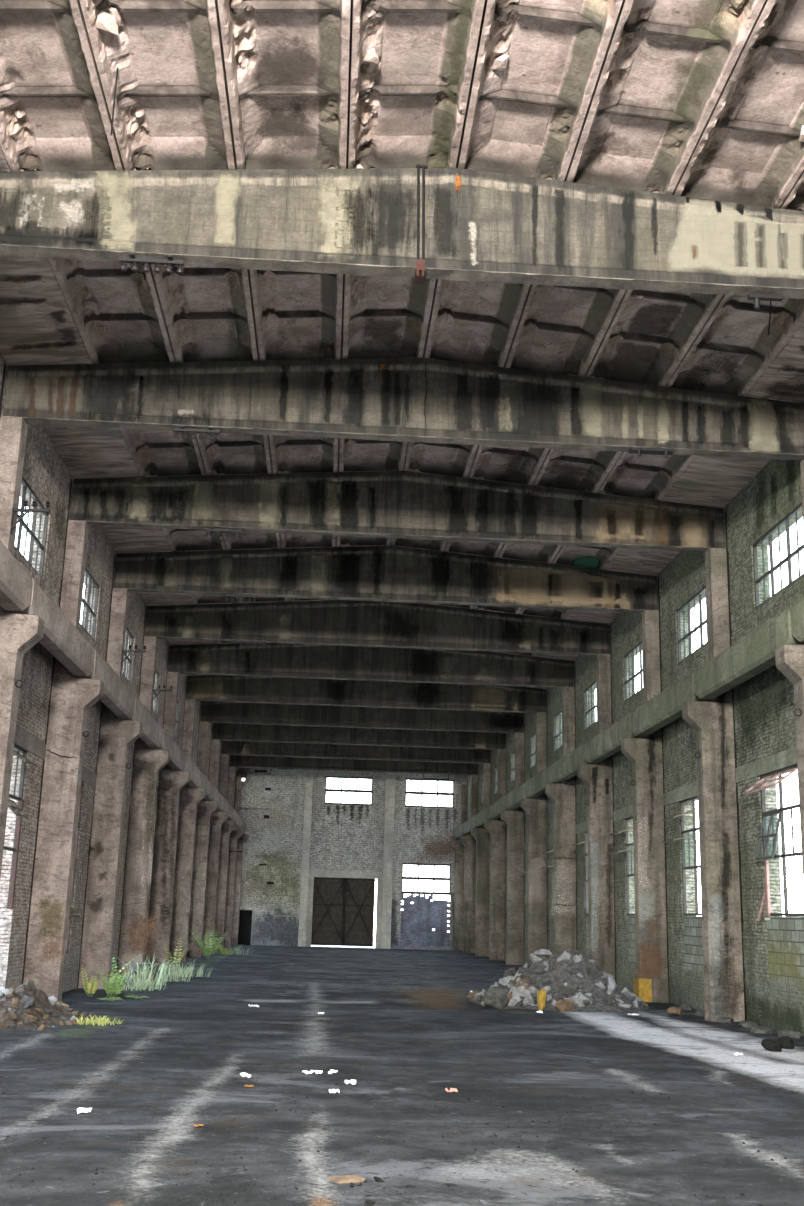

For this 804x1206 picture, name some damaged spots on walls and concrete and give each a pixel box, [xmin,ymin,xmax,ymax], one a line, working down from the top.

spalling [95,10,118,35]
water stain [252,37,324,164]
water stain [320,179,417,259]
water stain [434,186,457,256]
water stain [279,365,289,421]
water stain [324,366,364,426]
water stain [380,369,410,425]
water stain [454,304,740,444]
water stain [720,365,804,527]